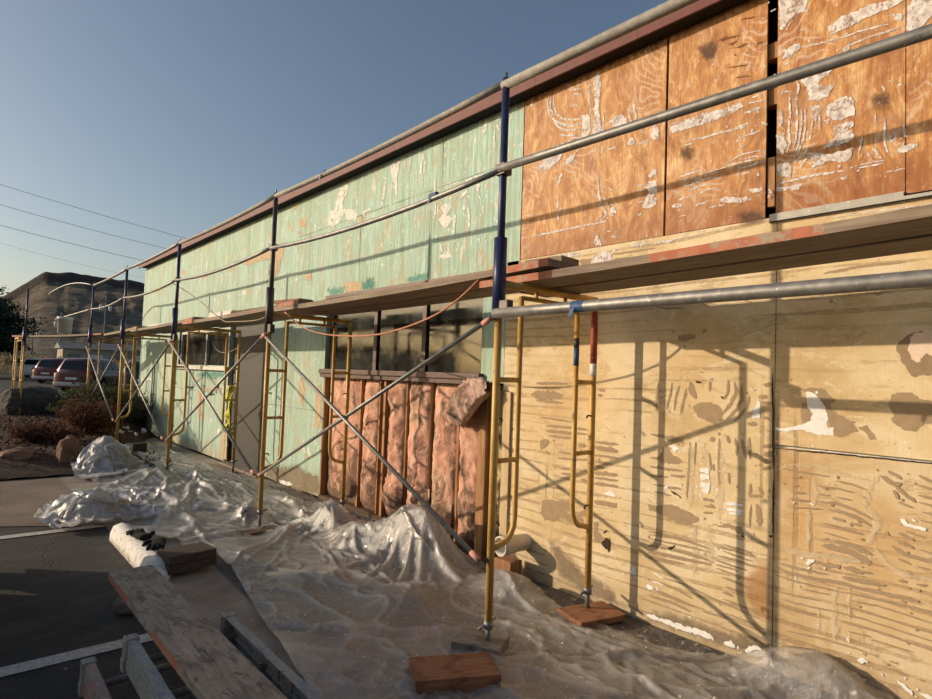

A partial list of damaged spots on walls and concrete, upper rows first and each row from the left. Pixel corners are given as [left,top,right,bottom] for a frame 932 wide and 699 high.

peeling [537,72,637,186]
peeling [670,70,922,217]
peeling [327,151,426,228]
peeling [433,171,487,267]
peeling [531,178,622,264]
peeling [635,166,657,216]
peeling [831,198,932,219]
peeling [244,238,284,278]
peeling [345,281,362,293]
peeling [751,401,760,419]
peeling [774,387,877,440]
peeling [888,392,932,432]